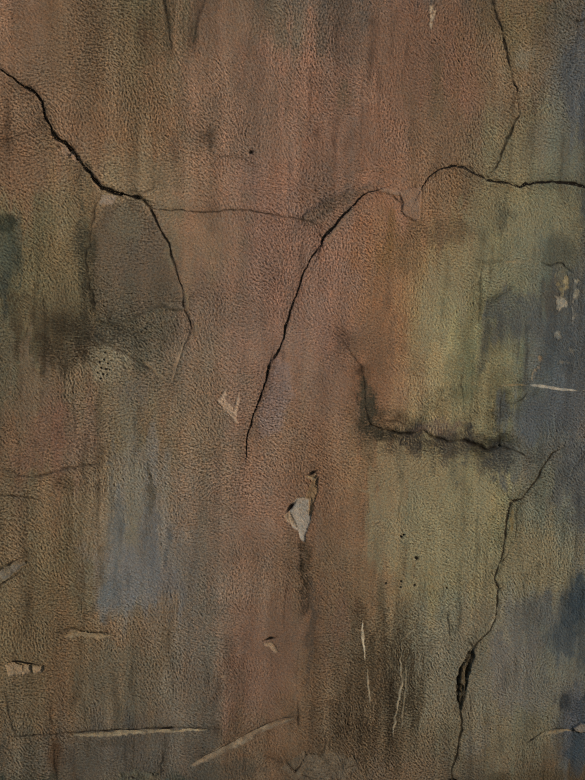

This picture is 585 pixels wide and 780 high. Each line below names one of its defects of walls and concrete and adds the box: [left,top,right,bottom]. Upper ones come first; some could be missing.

crack [159,0,208,54]
crack [421,0,585,191]
crack [0,68,381,456]
crack [474,258,516,326]
damp [0,142,277,780]
damp [330,129,585,780]
spalling [284,469,319,542]
crack [340,338,561,780]
spalling [5,660,45,677]
hole [189,716,295,769]
crack [265,730,327,780]